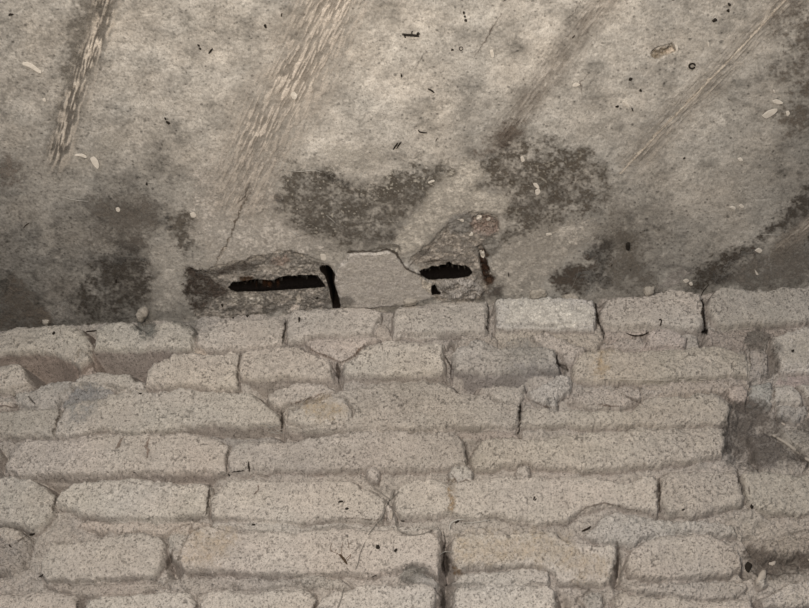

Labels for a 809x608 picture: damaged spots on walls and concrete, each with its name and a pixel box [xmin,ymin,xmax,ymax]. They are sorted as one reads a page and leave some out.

leakage [64,197,195,324]
spalling [181,250,341,319]
leakage [280,163,456,245]
spalling [410,212,500,301]
corrosion [480,248,494,285]
leakage [474,122,609,243]
leakage [688,186,809,291]